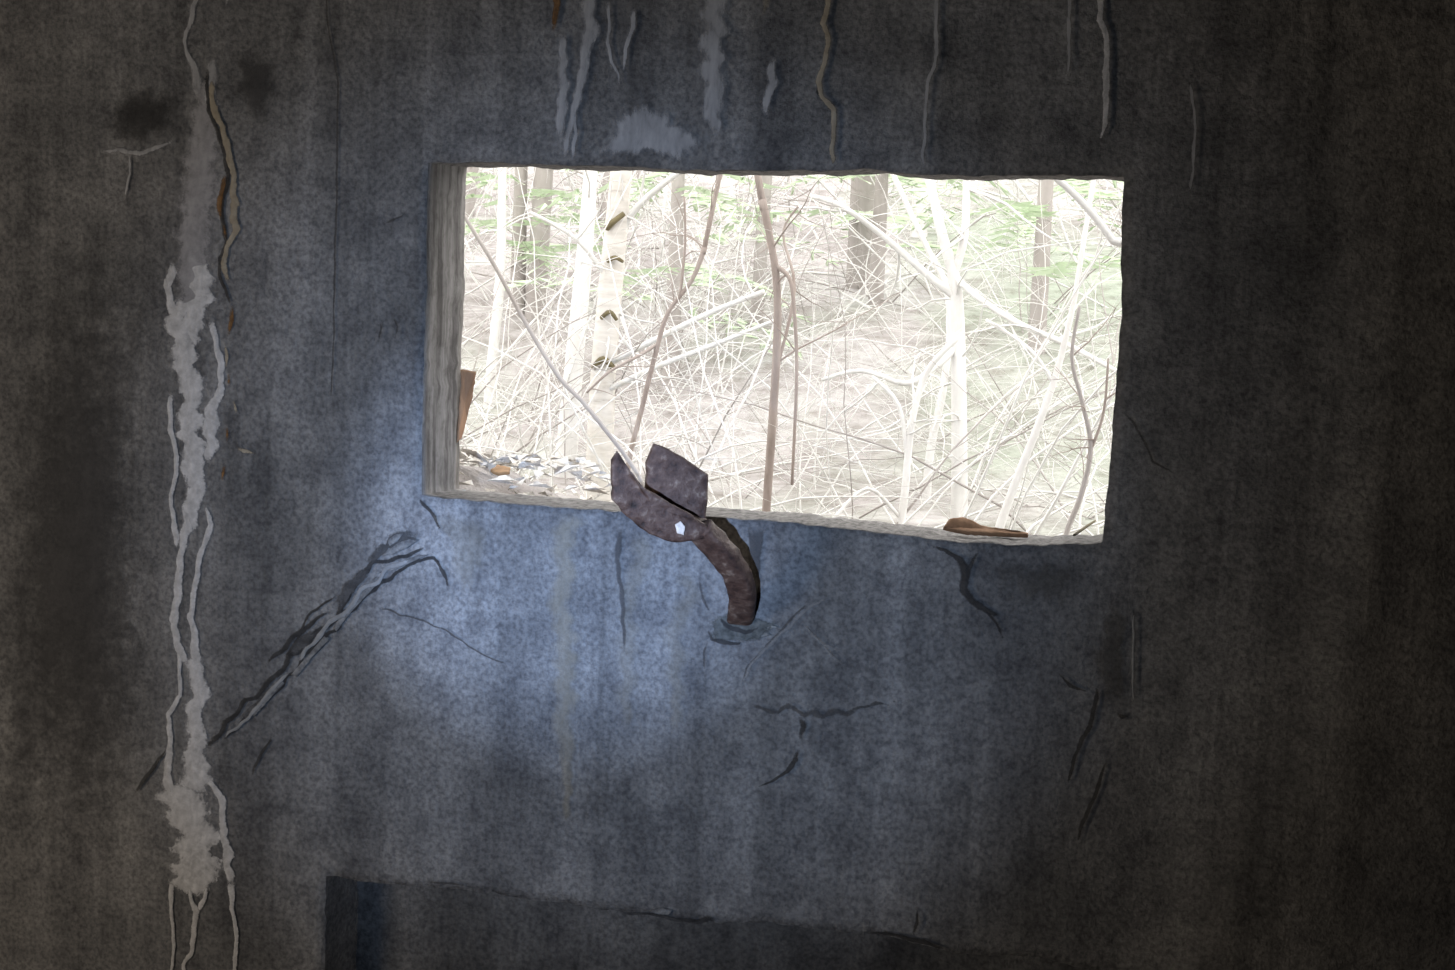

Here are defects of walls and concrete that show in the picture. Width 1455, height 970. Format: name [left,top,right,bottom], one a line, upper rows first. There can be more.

damp [606,6,635,79]
damp [610,107,696,157]
damp [699,0,727,131]
damp [763,62,777,112]
crack [205,74,252,478]
damp [155,0,239,970]
crack [208,500,500,772]
crack [744,607,895,786]
crack [936,547,1003,638]
crack [136,751,165,790]